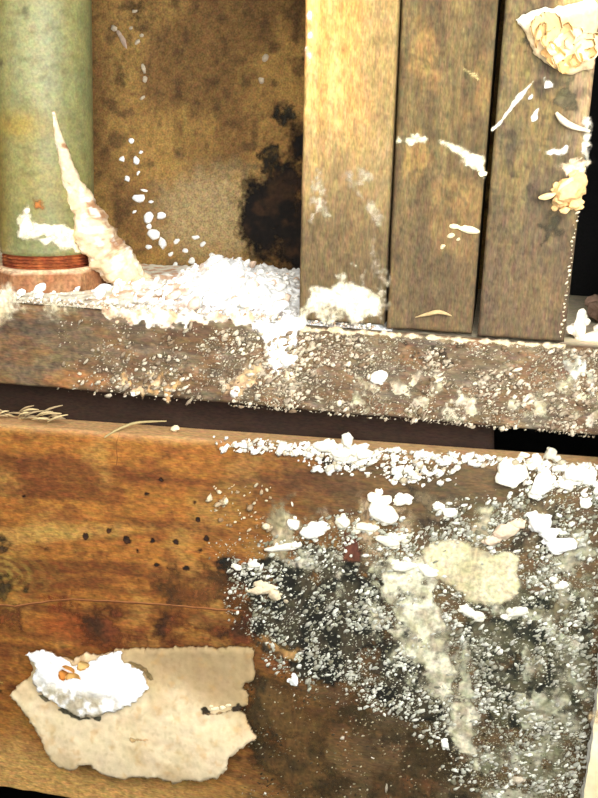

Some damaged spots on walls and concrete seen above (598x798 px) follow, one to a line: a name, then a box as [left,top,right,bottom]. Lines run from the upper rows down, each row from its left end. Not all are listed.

water stain [239,105,303,269]
water stain [57,323,166,393]
water stain [149,327,598,438]
water stain [0,574,22,631]
water stain [80,605,132,651]
crack [0,598,241,612]
water stain [150,470,598,798]